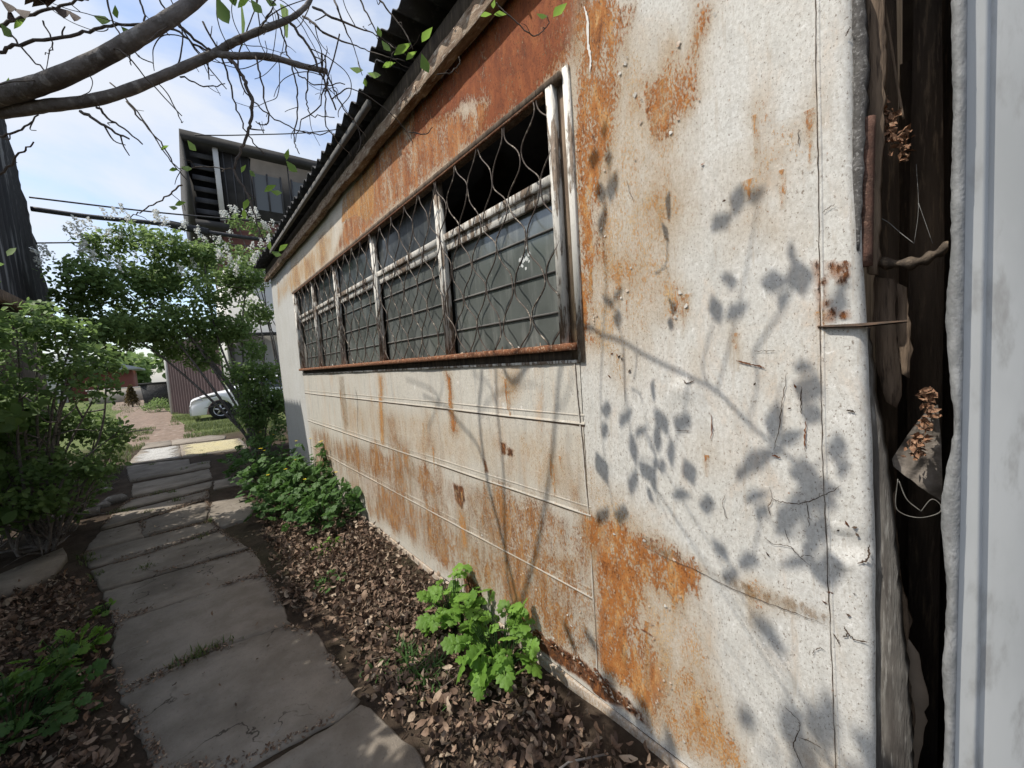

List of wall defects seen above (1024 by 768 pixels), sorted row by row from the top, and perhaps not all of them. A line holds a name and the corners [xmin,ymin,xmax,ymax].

corrosion [277,0,716,378]
corrosion [313,372,747,768]